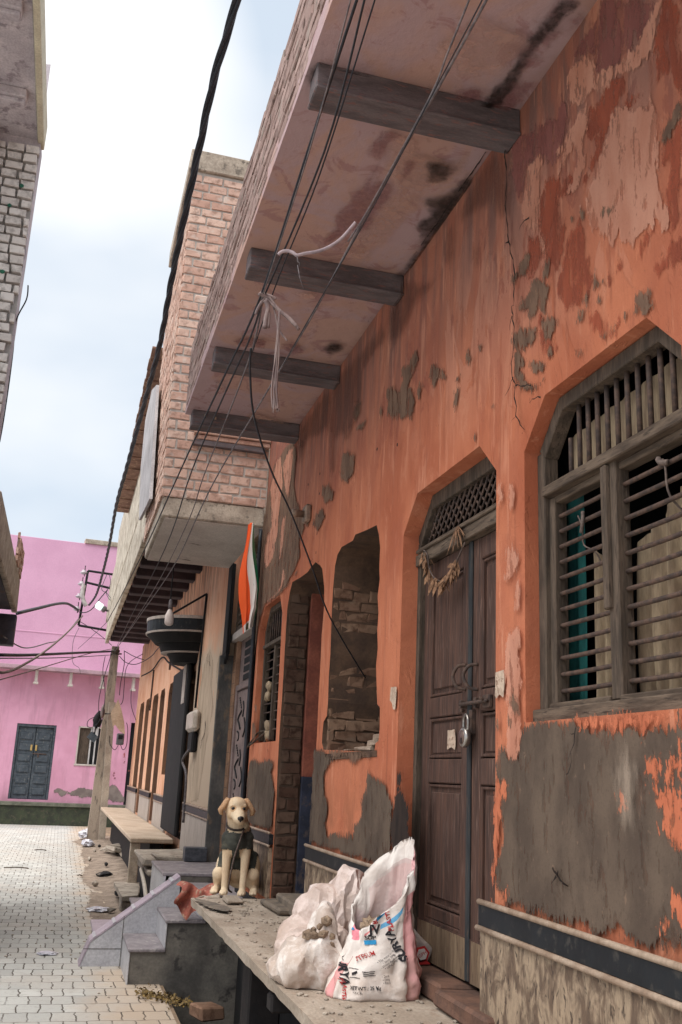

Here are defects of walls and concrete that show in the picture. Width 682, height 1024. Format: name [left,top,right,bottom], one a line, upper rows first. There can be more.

peeling [510,0,682,396]
crack [466,151,541,432]
flaking render [379,344,482,421]
flaking render [254,444,354,653]
peeling [497,483,515,511]
peeling [504,542,520,612]
flaking render [54,788,93,798]
flaking render [108,773,124,803]
flaking render [308,747,393,863]
flaking render [491,627,682,951]